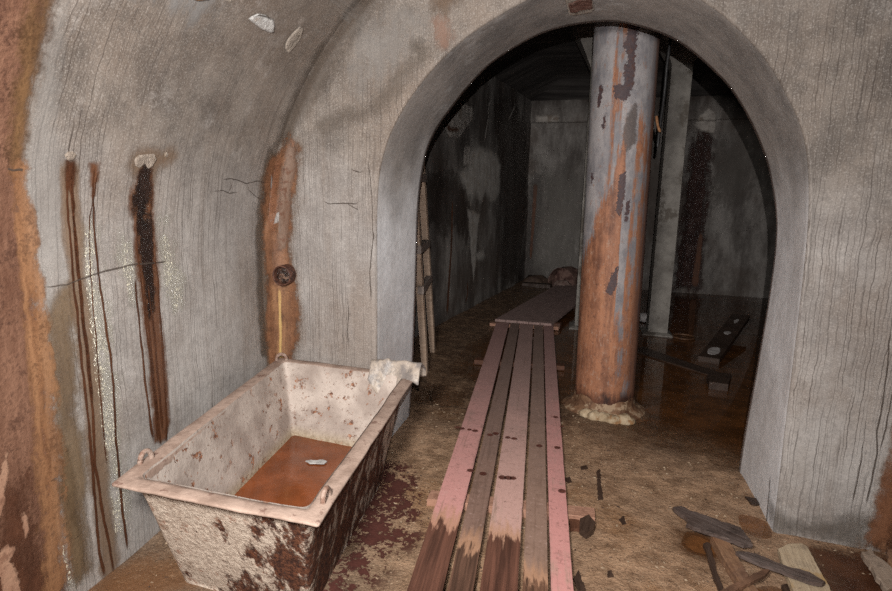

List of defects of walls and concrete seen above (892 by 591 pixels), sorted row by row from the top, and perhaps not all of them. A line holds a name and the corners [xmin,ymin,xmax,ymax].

spalling [249,14,274,33]
peeling [285,26,303,53]
corrosion [0,0,73,591]
corrosion [61,161,128,577]
corrosion [129,164,170,443]
corrosion [262,134,300,365]
leakage [427,98,543,284]
corrosion [810,547,882,591]
corrosion [868,451,892,563]